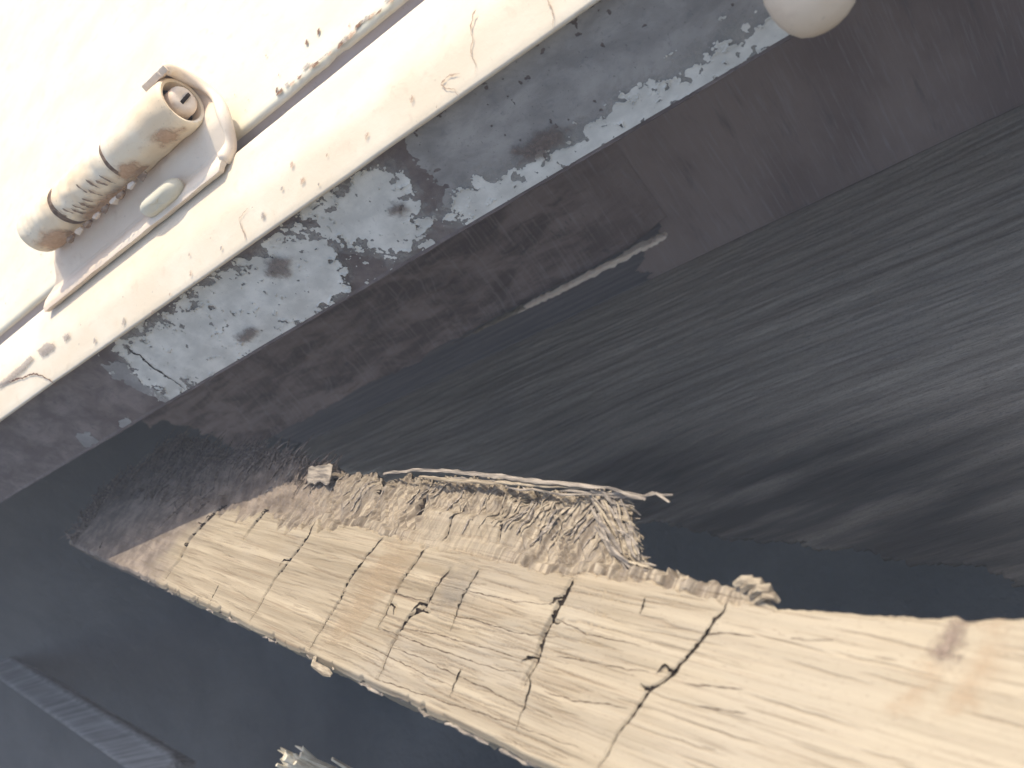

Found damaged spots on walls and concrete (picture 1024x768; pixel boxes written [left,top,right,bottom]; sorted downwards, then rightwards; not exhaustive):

peeling [98,0,790,402]
crack [123,343,183,388]
crack [167,505,227,577]
crack [253,524,314,616]
peeling [307,463,333,486]
crack [310,539,382,648]
crack [417,498,426,516]
crack [356,511,753,767]